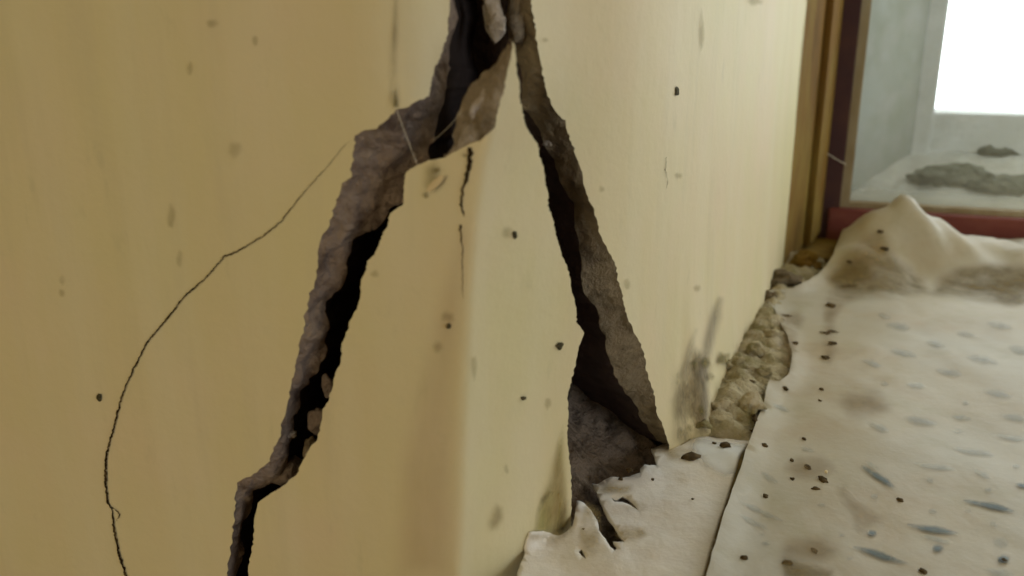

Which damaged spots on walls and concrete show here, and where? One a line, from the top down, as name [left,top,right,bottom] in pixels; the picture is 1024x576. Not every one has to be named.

crack [104,0,669,576]